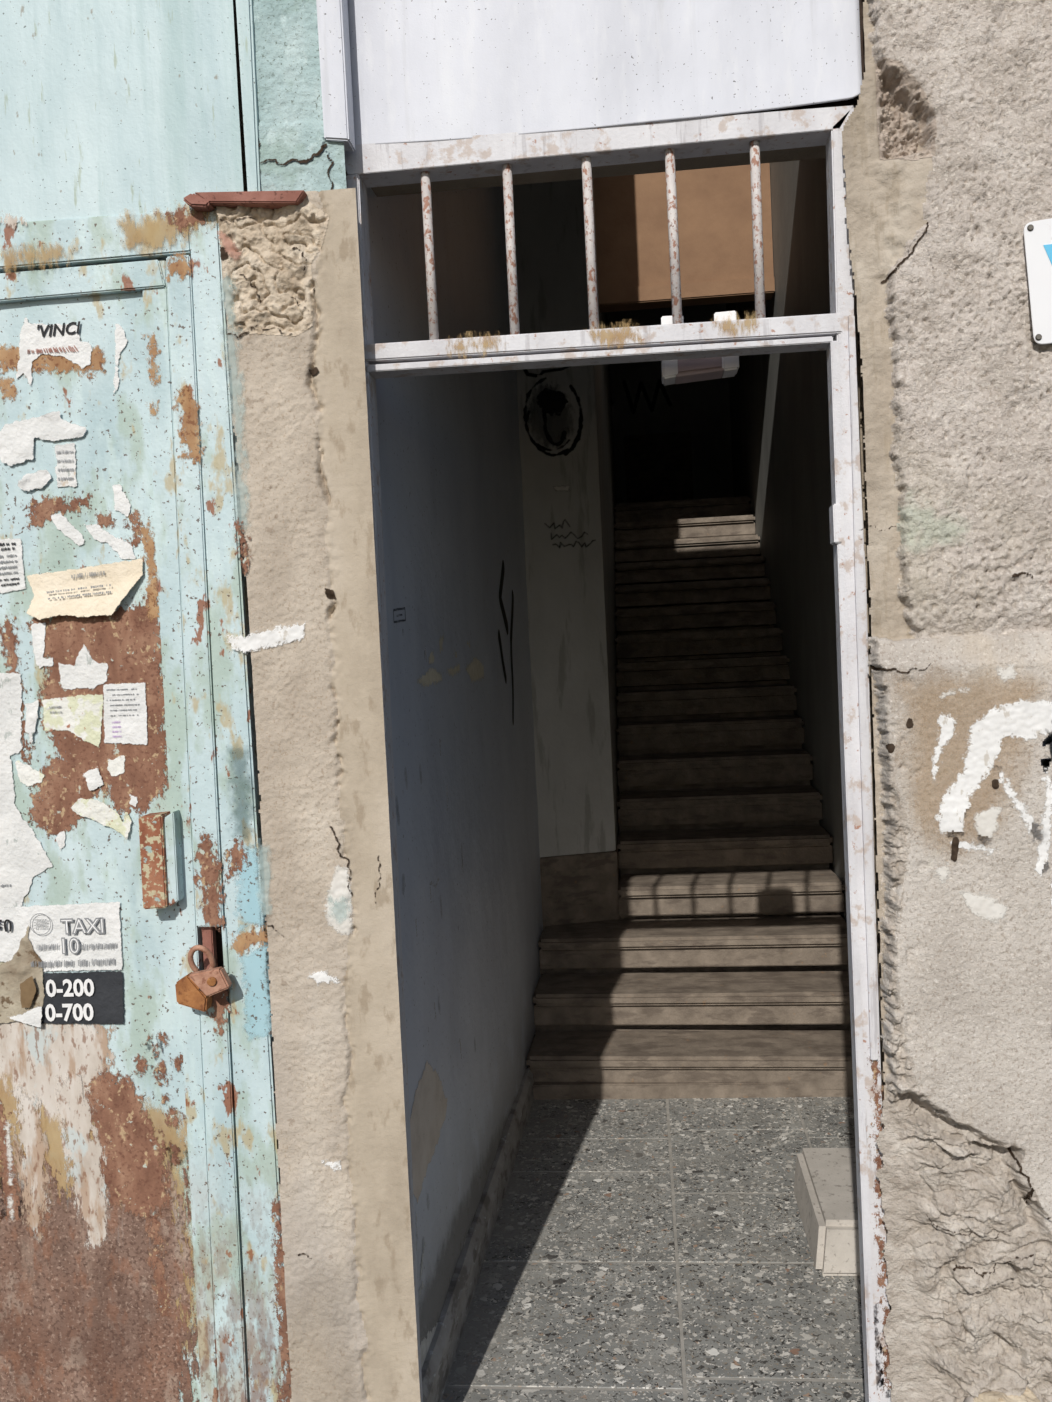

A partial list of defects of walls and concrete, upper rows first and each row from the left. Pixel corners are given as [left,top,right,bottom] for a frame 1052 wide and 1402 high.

crack [258,138,334,190]
corrosion [0,244,73,273]
corrosion [118,201,217,282]
corrosion [142,332,205,473]
spalling [216,199,329,338]
corrosion [450,333,497,357]
corrosion [715,314,756,335]
corrosion [0,492,169,842]
peeling [410,1061,447,1203]
spalling [875,725,1052,1402]
corrosion [0,1032,200,1402]
corrosion [865,1057,892,1395]